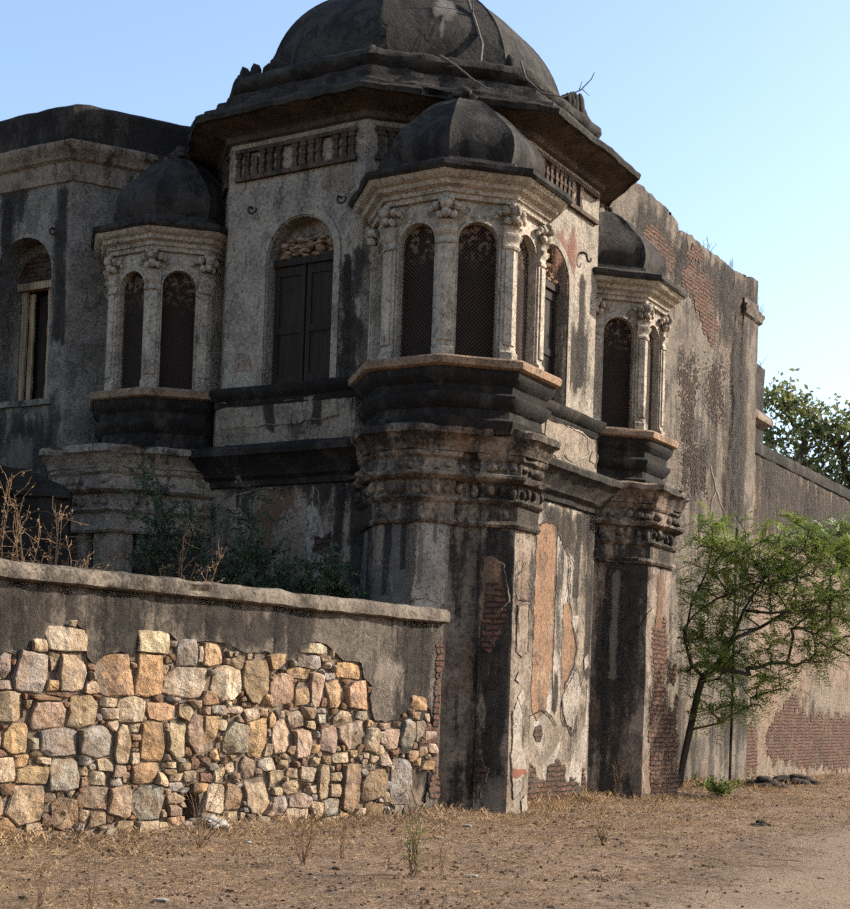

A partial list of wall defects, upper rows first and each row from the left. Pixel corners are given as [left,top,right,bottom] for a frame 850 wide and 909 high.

leakage [0,190,27,341]
leakage [0,393,61,478]
leakage [51,185,68,345]
leakage [336,246,367,377]
flaking render [644,223,729,501]
leakage [638,196,850,565]
flaking render [420,643,445,799]
peeling [478,556,510,653]
leakage [478,528,515,790]
peeling [509,523,589,812]
flaking render [648,575,681,797]
flaking render [746,694,850,777]